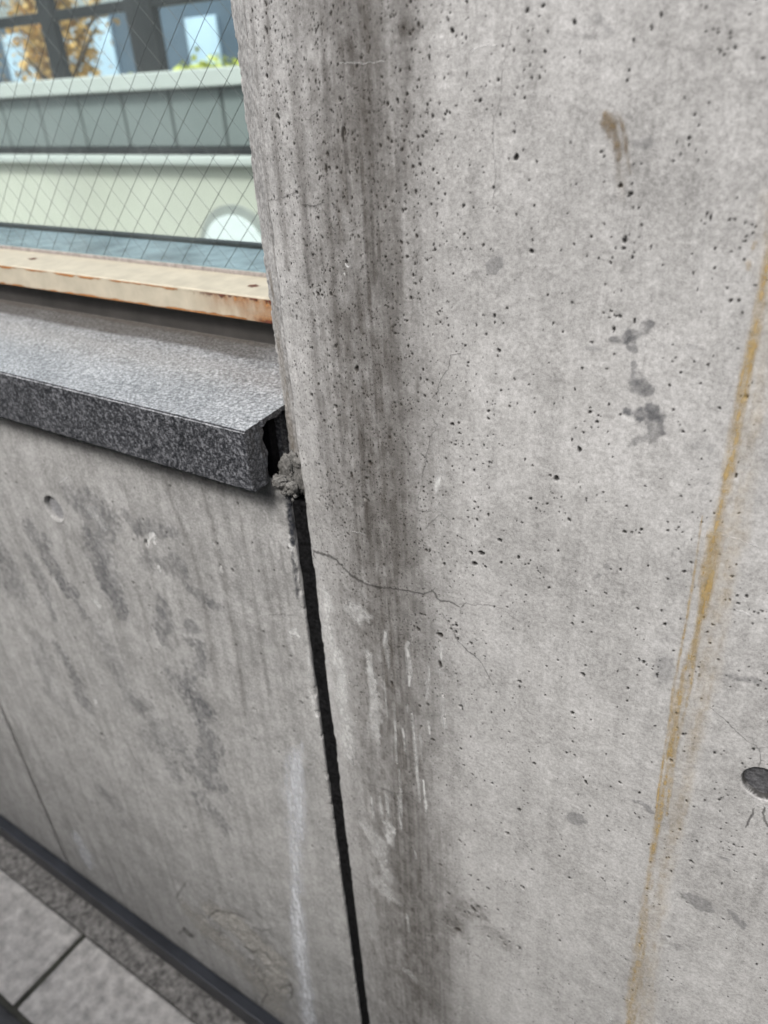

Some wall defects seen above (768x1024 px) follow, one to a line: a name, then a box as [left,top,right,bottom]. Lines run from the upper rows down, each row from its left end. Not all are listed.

leakage [335,0,438,1024]
leakage [623,380,661,422]
corrosion [688,321,758,624]
efflorescence [286,743,317,1024]
efflorescence [322,588,353,759]
corrosion [651,655,693,859]